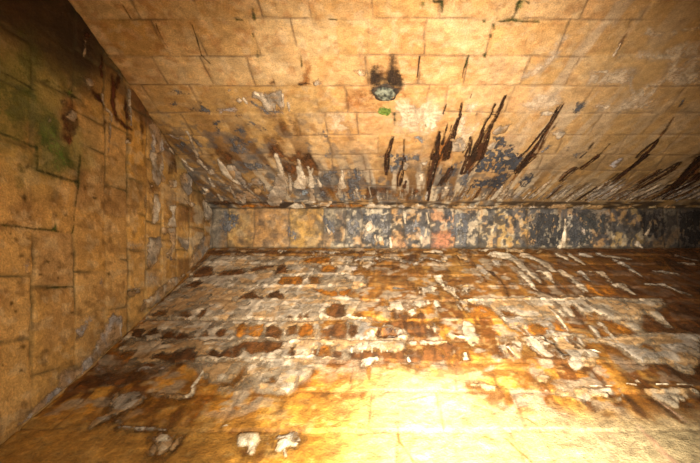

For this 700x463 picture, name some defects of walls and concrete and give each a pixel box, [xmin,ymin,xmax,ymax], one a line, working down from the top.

leakage [84,56,132,150]
leakage [371,56,402,95]
leakage [24,91,700,462]